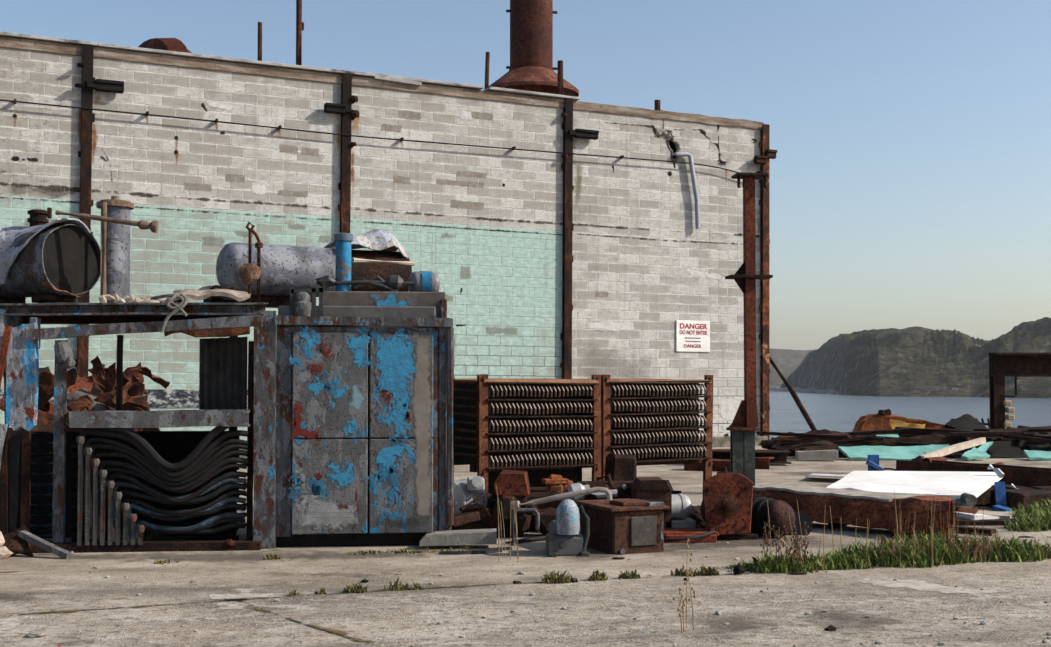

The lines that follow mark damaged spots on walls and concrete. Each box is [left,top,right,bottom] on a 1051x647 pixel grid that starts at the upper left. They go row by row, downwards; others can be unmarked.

corrosion [78,110,97,157]
crack [606,119,721,161]